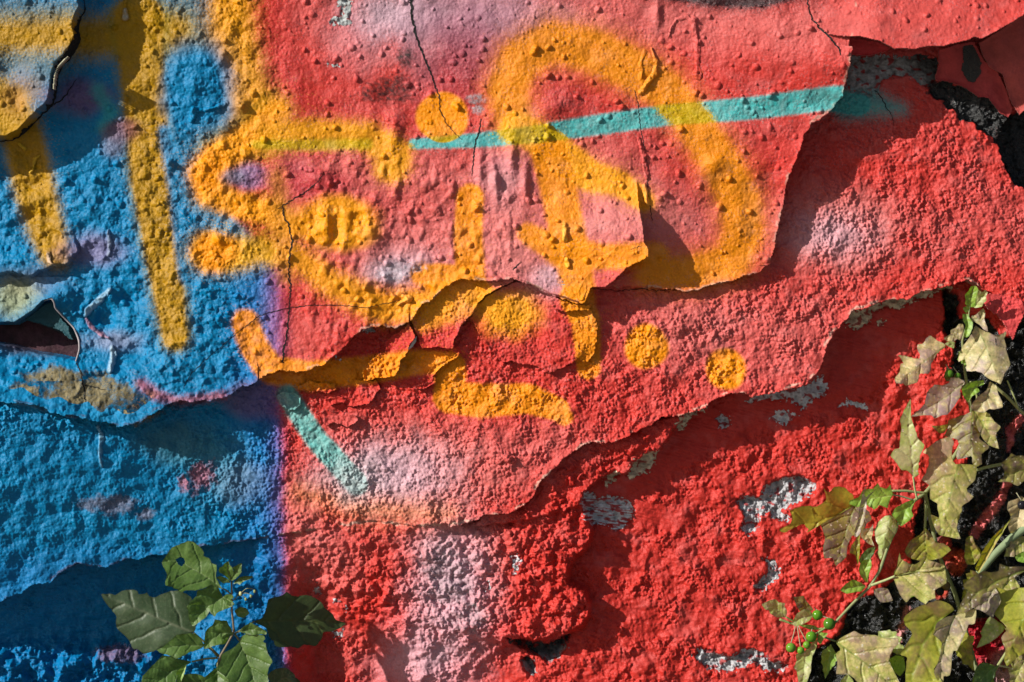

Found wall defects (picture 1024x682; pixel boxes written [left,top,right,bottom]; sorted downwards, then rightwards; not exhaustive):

crack [0,1,86,142]
crack [409,0,481,173]
crack [807,0,841,55]
peeling [648,15,1024,292]
crack [184,175,392,386]
peeling [0,198,648,427]
peeling [448,269,1024,682]